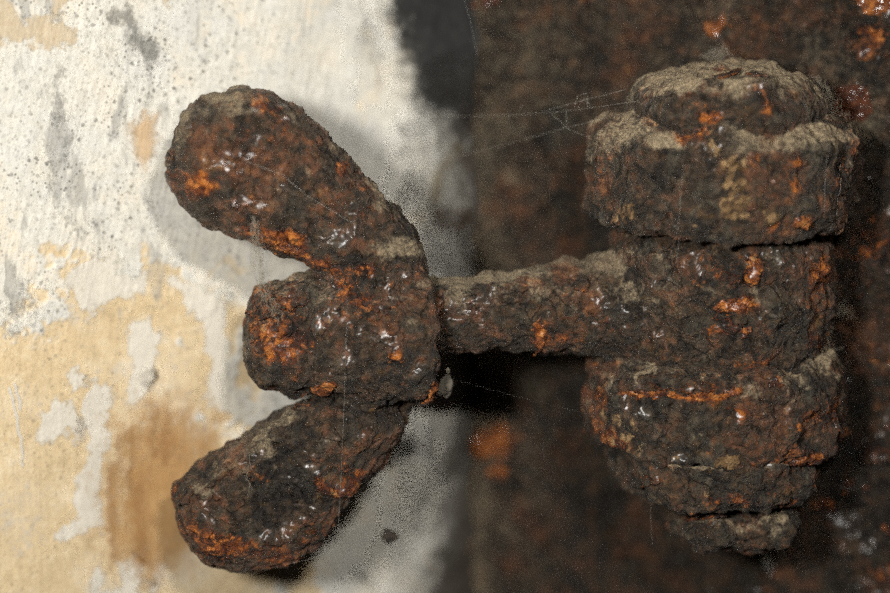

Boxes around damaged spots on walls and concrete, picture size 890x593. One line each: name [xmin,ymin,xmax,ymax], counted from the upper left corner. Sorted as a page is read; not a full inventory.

spalling [0,0,76,50]
peeling [65,253,147,320]
rust [730,257,762,285]
peeling [127,315,161,404]
peeling [167,273,254,422]
rust [244,297,301,336]
rust [529,317,547,356]
rust [711,296,753,339]
rust [629,373,743,402]
peeling [36,364,114,542]
rust [111,413,214,564]
peeling [86,555,171,593]